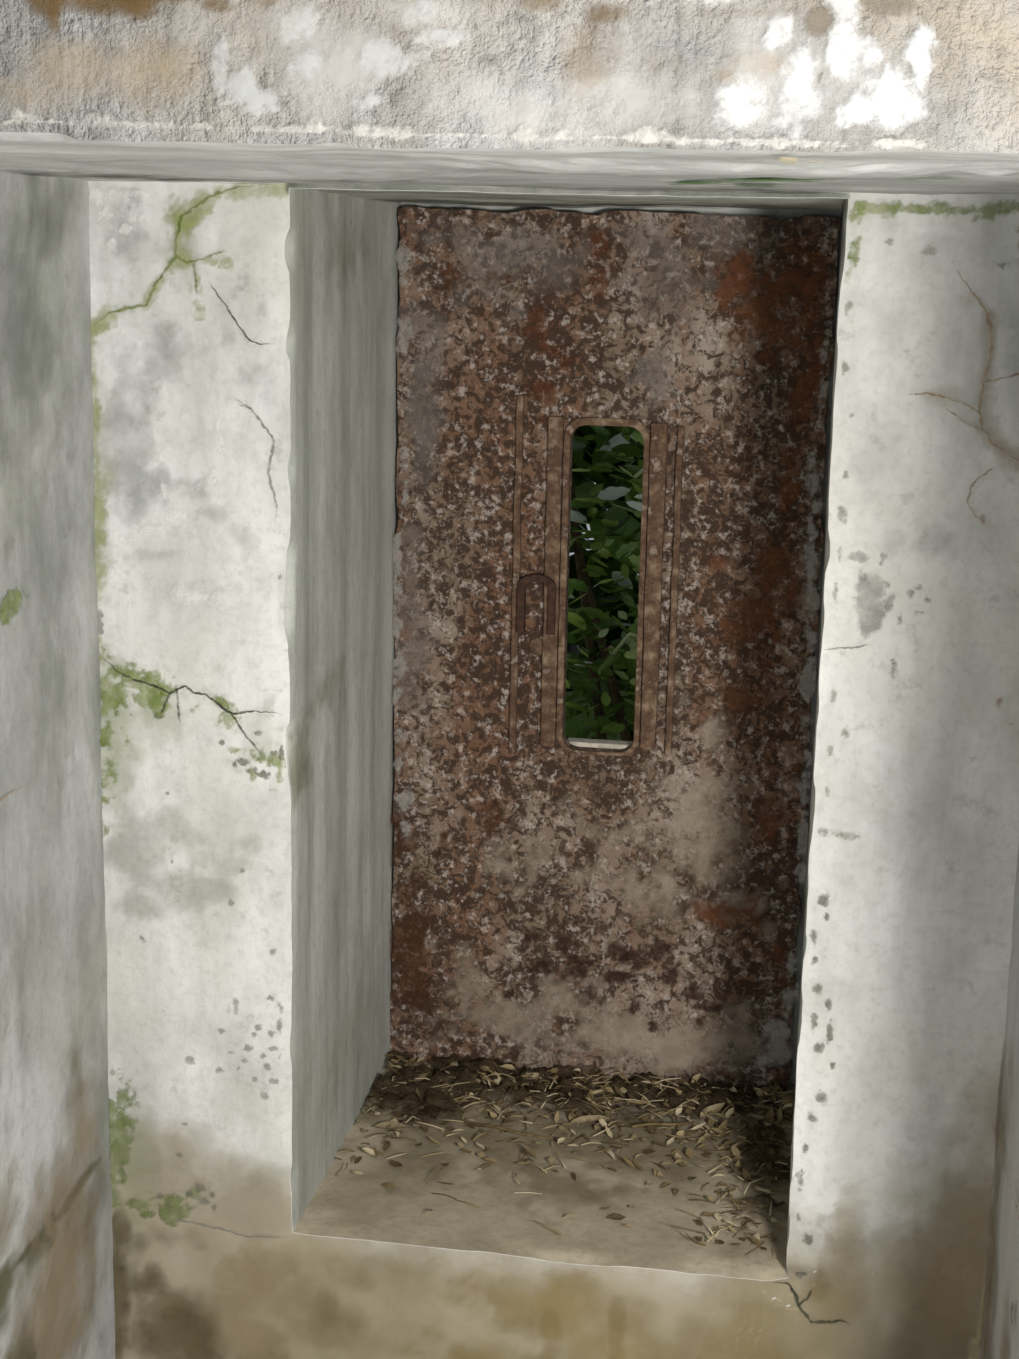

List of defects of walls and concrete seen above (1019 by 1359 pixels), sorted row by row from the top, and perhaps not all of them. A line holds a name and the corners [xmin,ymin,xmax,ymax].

corrosion [479,800,501,837]
corrosion [389,875,436,1010]
leakage [0,1164,96,1359]
leakage [112,1164,994,1359]
crack [774,1282,851,1325]